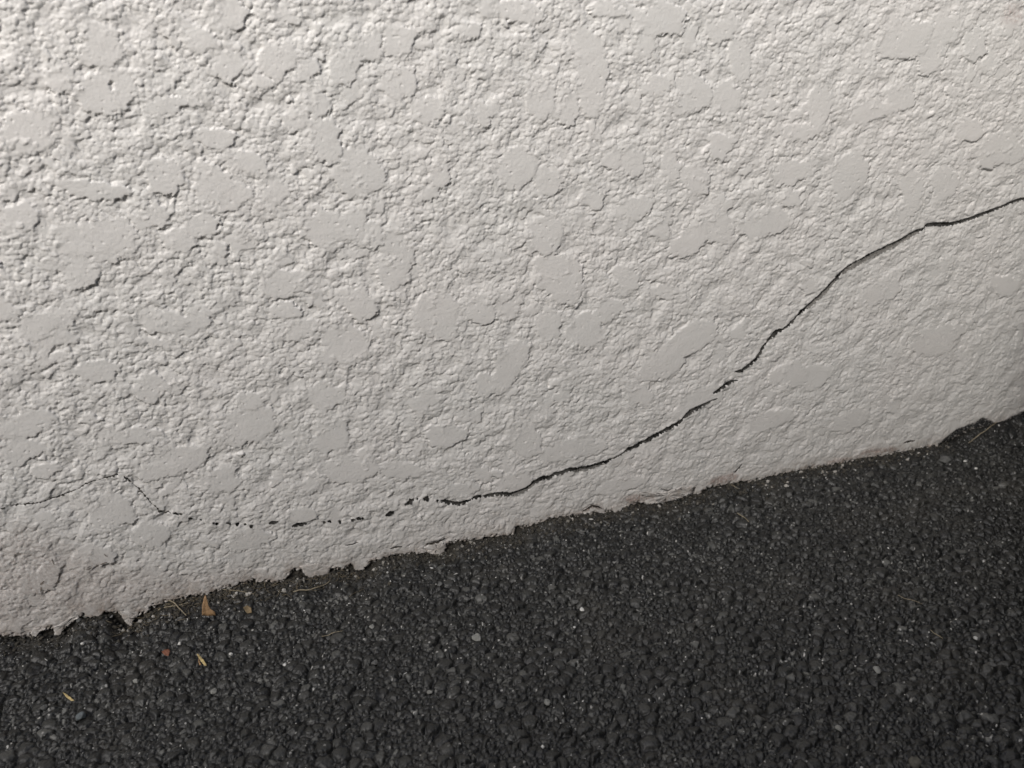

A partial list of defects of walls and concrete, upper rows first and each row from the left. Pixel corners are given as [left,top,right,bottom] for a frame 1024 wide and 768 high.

crack [1,197,1024,528]